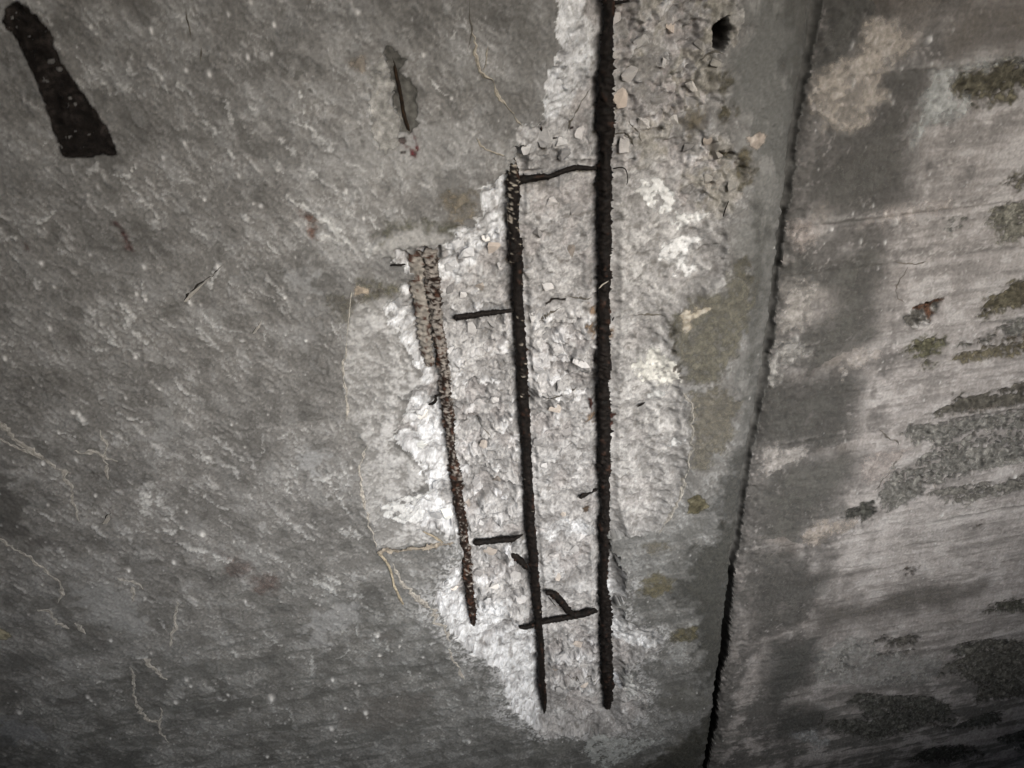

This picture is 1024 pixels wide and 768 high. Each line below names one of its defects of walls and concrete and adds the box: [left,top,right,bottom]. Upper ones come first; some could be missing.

leakage [818,0,875,71]
spalling [367,45,419,155]
spalling [383,0,756,740]
leakage [753,249,881,625]
leakage [821,588,981,627]
leakage [763,639,827,738]